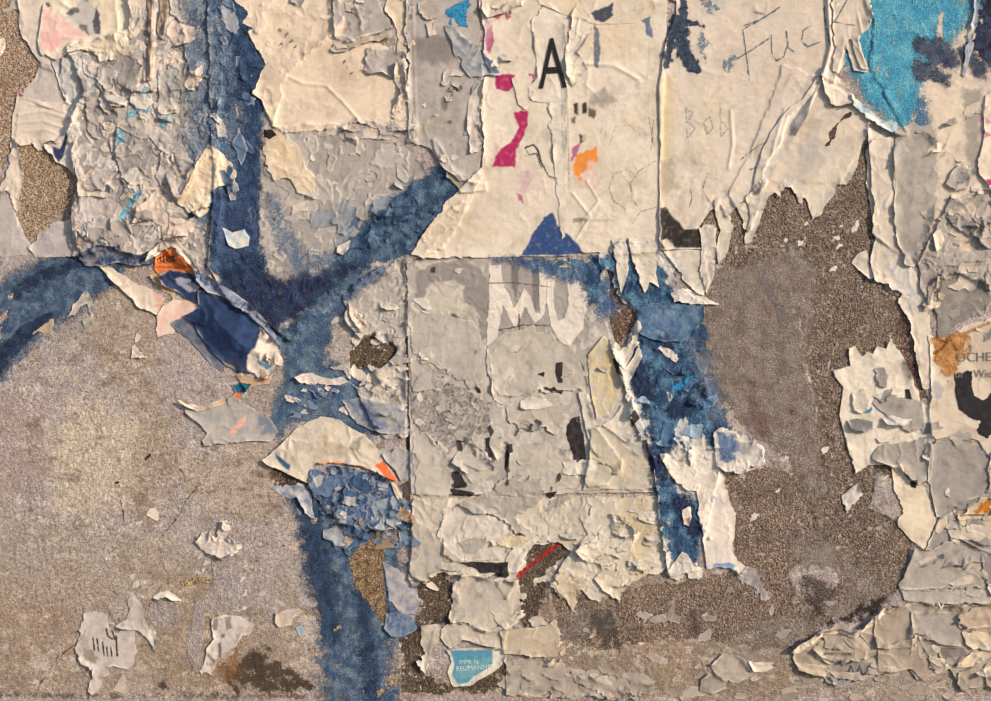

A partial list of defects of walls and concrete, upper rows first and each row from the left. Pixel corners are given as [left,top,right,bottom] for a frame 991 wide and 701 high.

peeling [0,0,256,247]
peeling [317,0,418,155]
peeling [422,76,485,124]
peeling [491,54,513,67]
peeling [946,101,988,125]
peeling [256,329,284,378]
spalling [269,140,991,701]